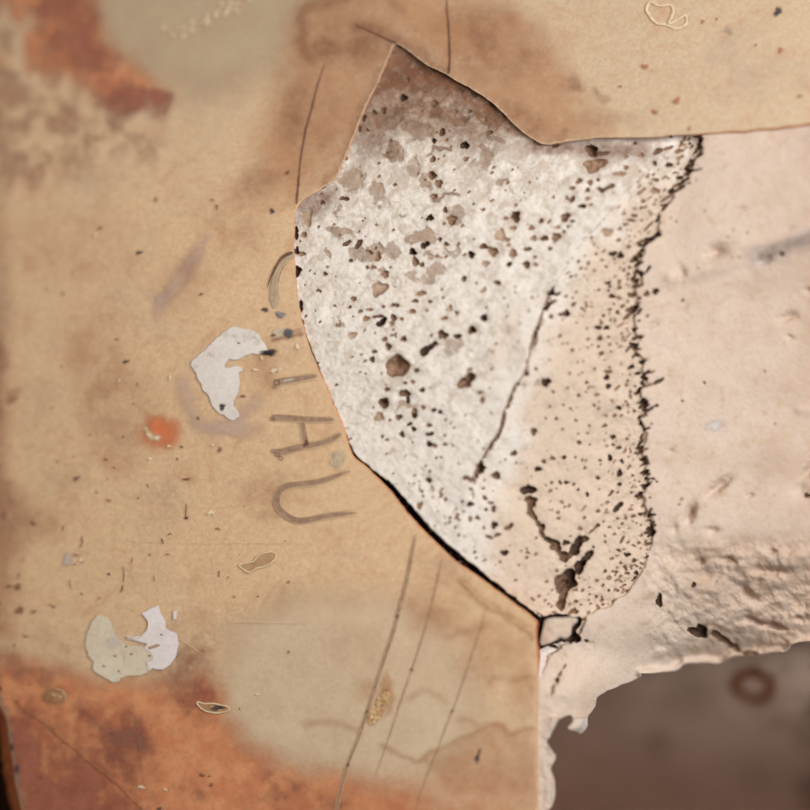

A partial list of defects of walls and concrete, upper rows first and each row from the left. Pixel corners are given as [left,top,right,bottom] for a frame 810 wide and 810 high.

corrosion [1,0,171,115]
leakage [359,45,520,144]
peeling [191,327,267,420]
spalling [293,44,810,810]
crack [473,169,650,478]
peeling [86,606,179,683]